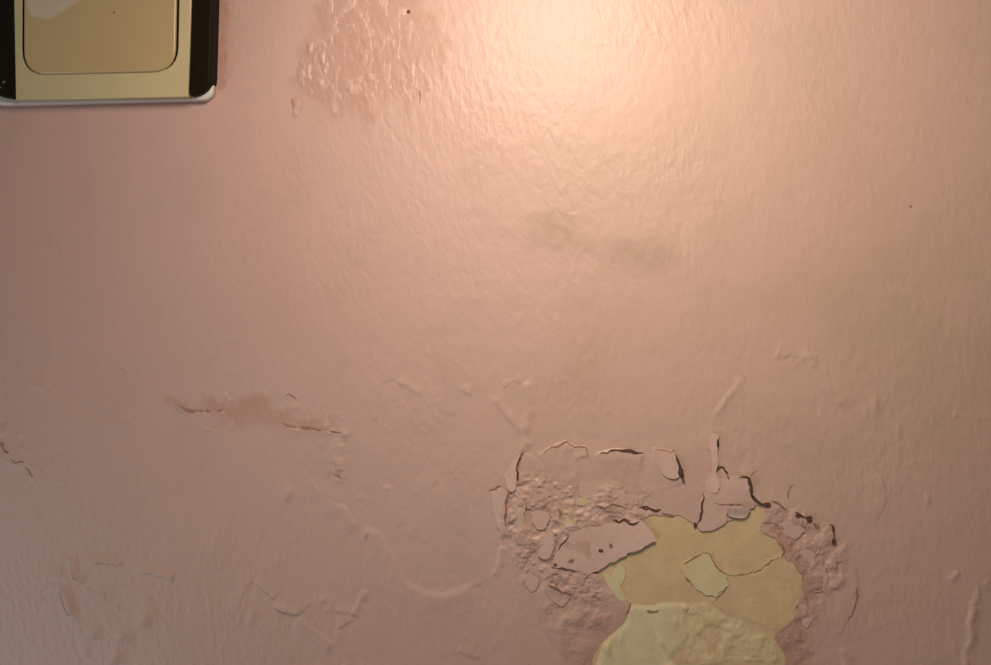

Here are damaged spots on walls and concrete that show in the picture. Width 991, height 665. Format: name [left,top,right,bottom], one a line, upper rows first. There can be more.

damp [283,0,463,133]
peeling [483,424,867,665]